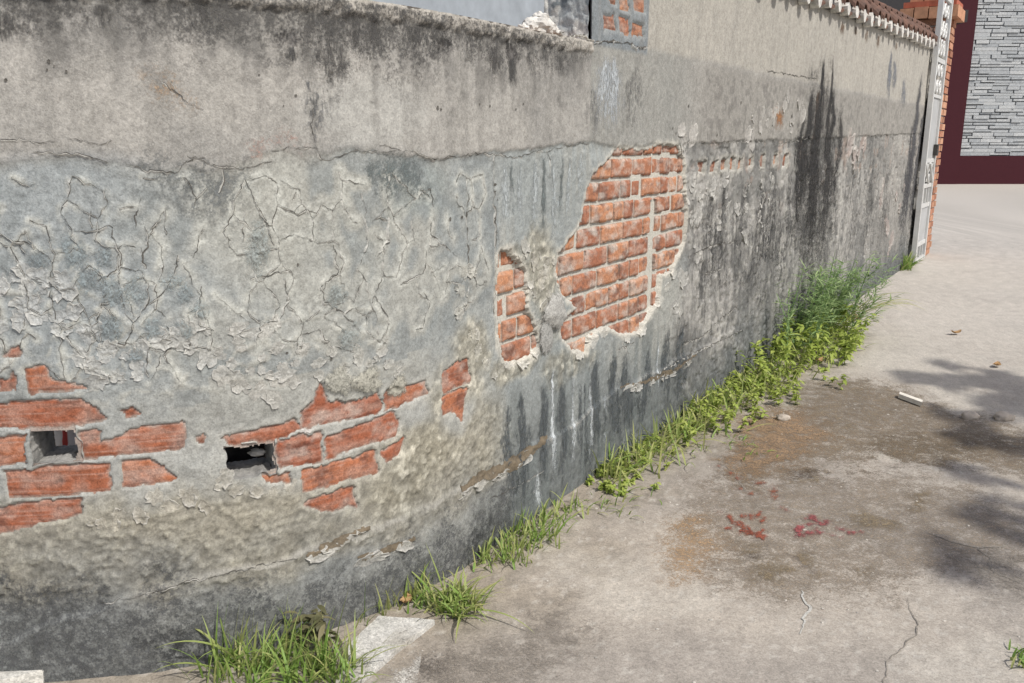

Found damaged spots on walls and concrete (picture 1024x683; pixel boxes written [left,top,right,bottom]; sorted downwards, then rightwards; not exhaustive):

leakage [0,0,582,82]
crack [0,109,589,381]
flaking render [441,87,806,422]
leakage [698,190,727,290]
leakage [736,64,843,284]
leakage [887,55,924,234]
flaking render [0,260,428,534]
leakage [0,326,687,683]
spalling [459,435,548,501]
crack [882,598,919,683]